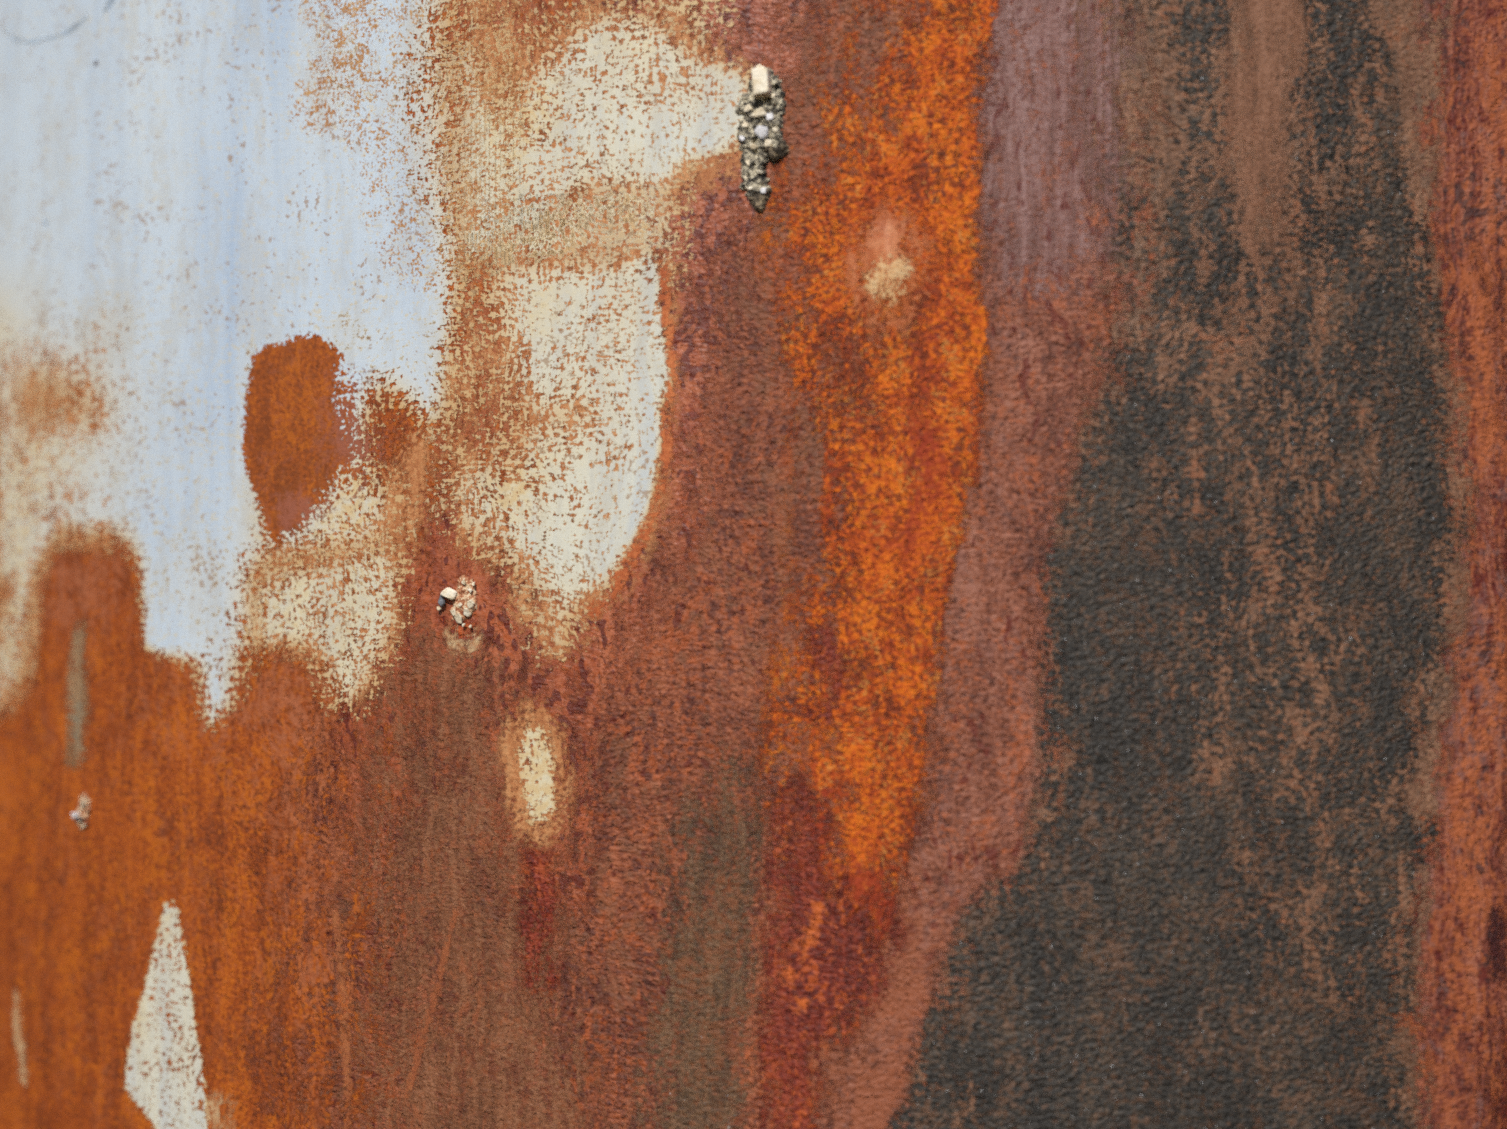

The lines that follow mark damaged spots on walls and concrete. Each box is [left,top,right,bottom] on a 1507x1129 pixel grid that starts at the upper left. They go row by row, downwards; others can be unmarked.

spalling [71,792,91,830]
peeling [123,899,208,1129]
peeling [0,0,789,733]
peeling [514,722,557,827]
corrosion [0,0,1168,1129]
corrosion [1391,0,1507,1129]